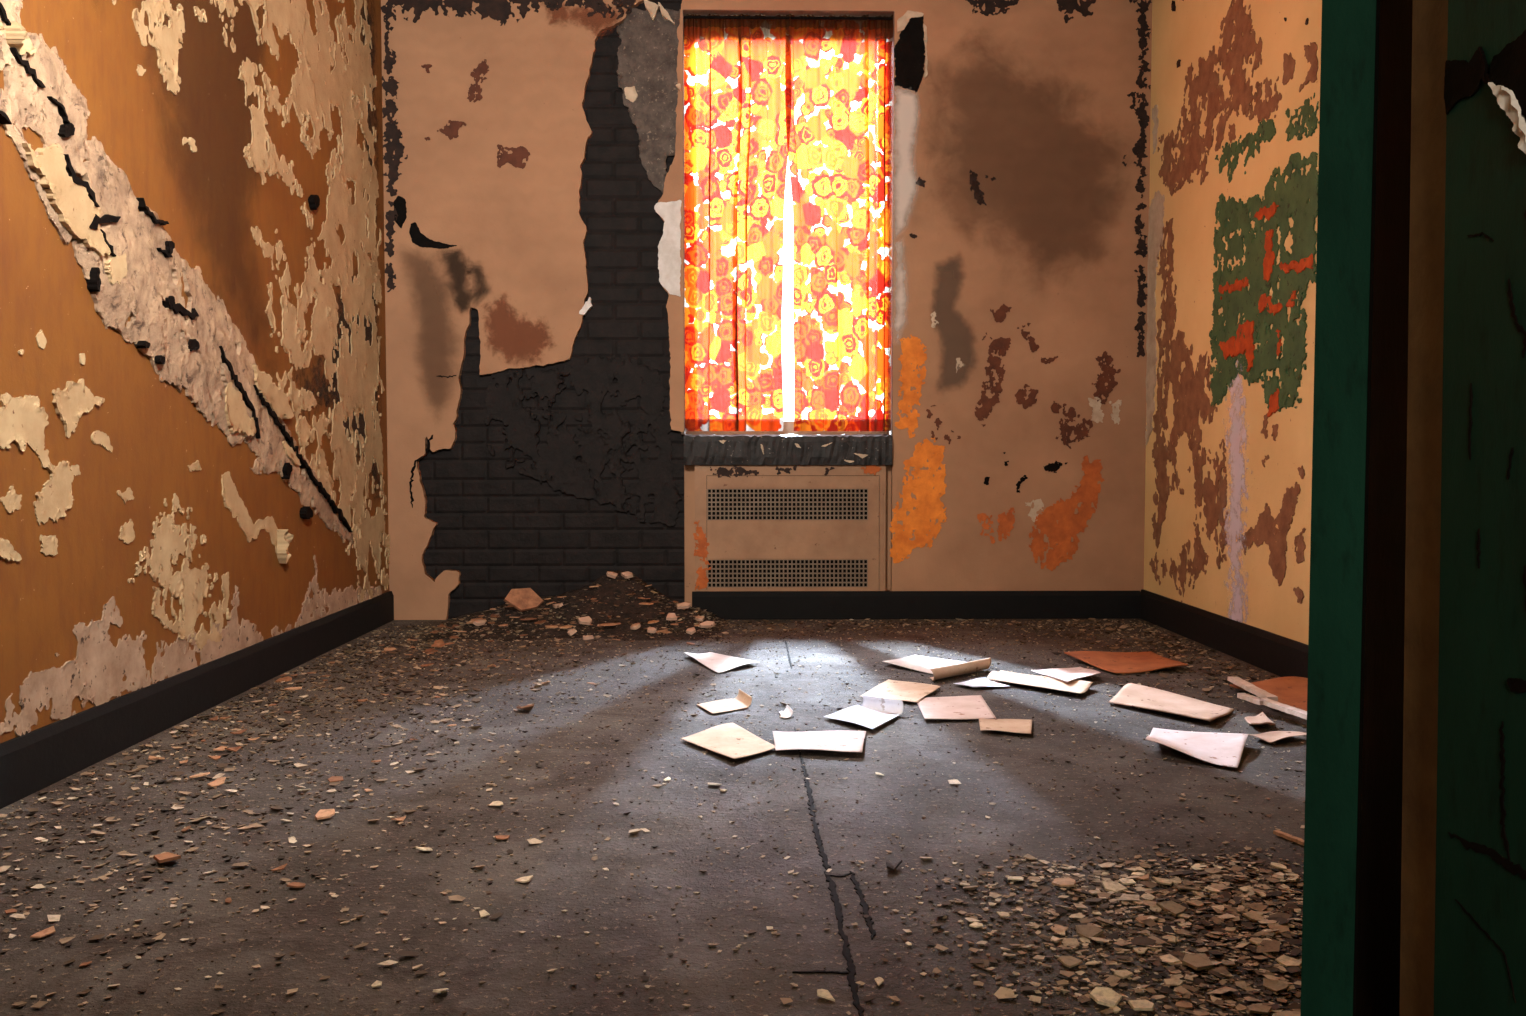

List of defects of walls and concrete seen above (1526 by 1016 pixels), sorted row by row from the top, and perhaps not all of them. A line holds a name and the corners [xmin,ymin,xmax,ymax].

crack [0,2,173,258]
flaking render [894,15,926,93]
peeling [967,0,1019,16]
peeling [1057,0,1096,23]
crack [172,303,199,320]
crack [219,346,353,532]
flaking render [0,0,711,736]
peeling [861,465,881,475]
peeling [889,311,961,563]
peeling [1122,0,1319,604]
crack [792,727,876,1016]